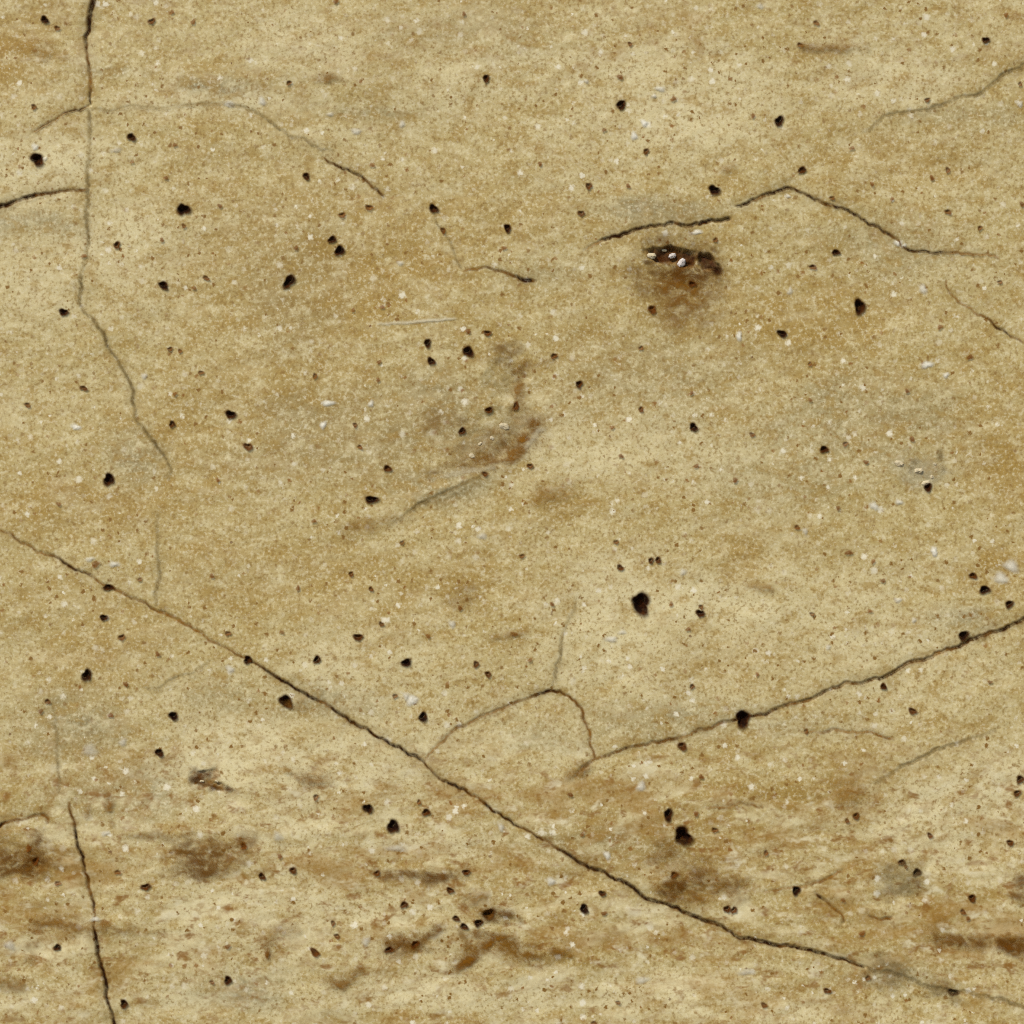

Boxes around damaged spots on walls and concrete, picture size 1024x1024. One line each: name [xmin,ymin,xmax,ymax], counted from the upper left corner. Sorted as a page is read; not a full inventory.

crack [34,0,96,137]
crack [871,64,1024,129]
crack [260,115,383,196]
crack [0,162,90,246]
crack [594,186,996,257]
crack [466,266,535,282]
crack [947,288,1021,341]
crack [78,275,172,472]
crack [0,530,1024,1024]